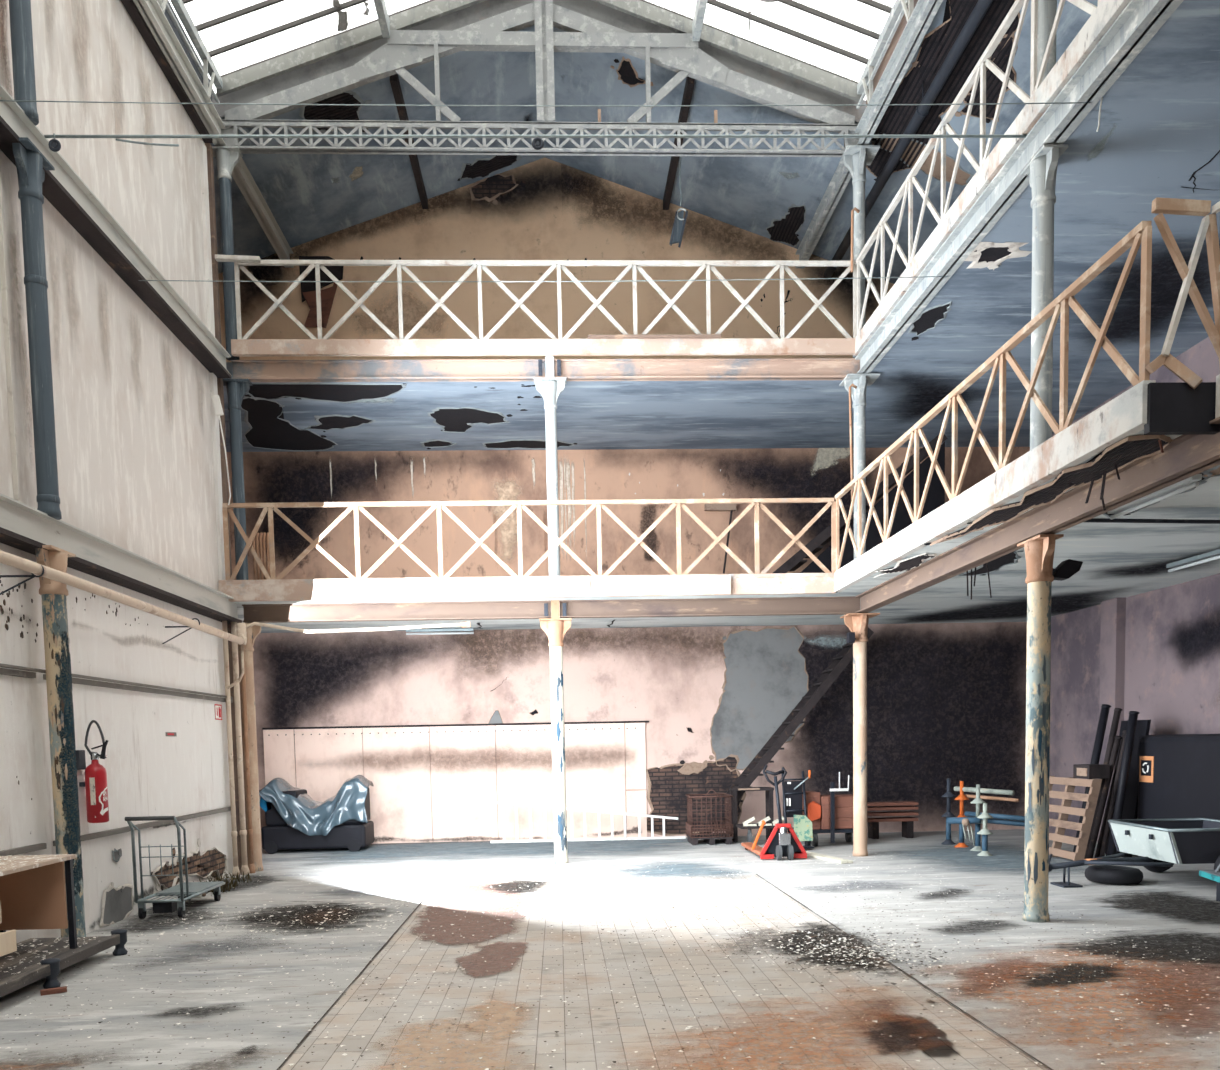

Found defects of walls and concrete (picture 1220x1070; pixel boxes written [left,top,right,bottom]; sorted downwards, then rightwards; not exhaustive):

flaking render [610,57,653,88]
flaking render [866,0,1020,186]
flaking render [457,155,526,205]
flaking render [765,204,806,247]
flaking render [965,242,1032,270]
flaking render [908,301,952,341]
flaking render [241,383,407,451]
flaking render [420,384,542,449]
flaking render [482,439,577,449]
flaking render [873,435,1174,578]
peeling [0,577,84,895]
flaking render [646,626,846,836]